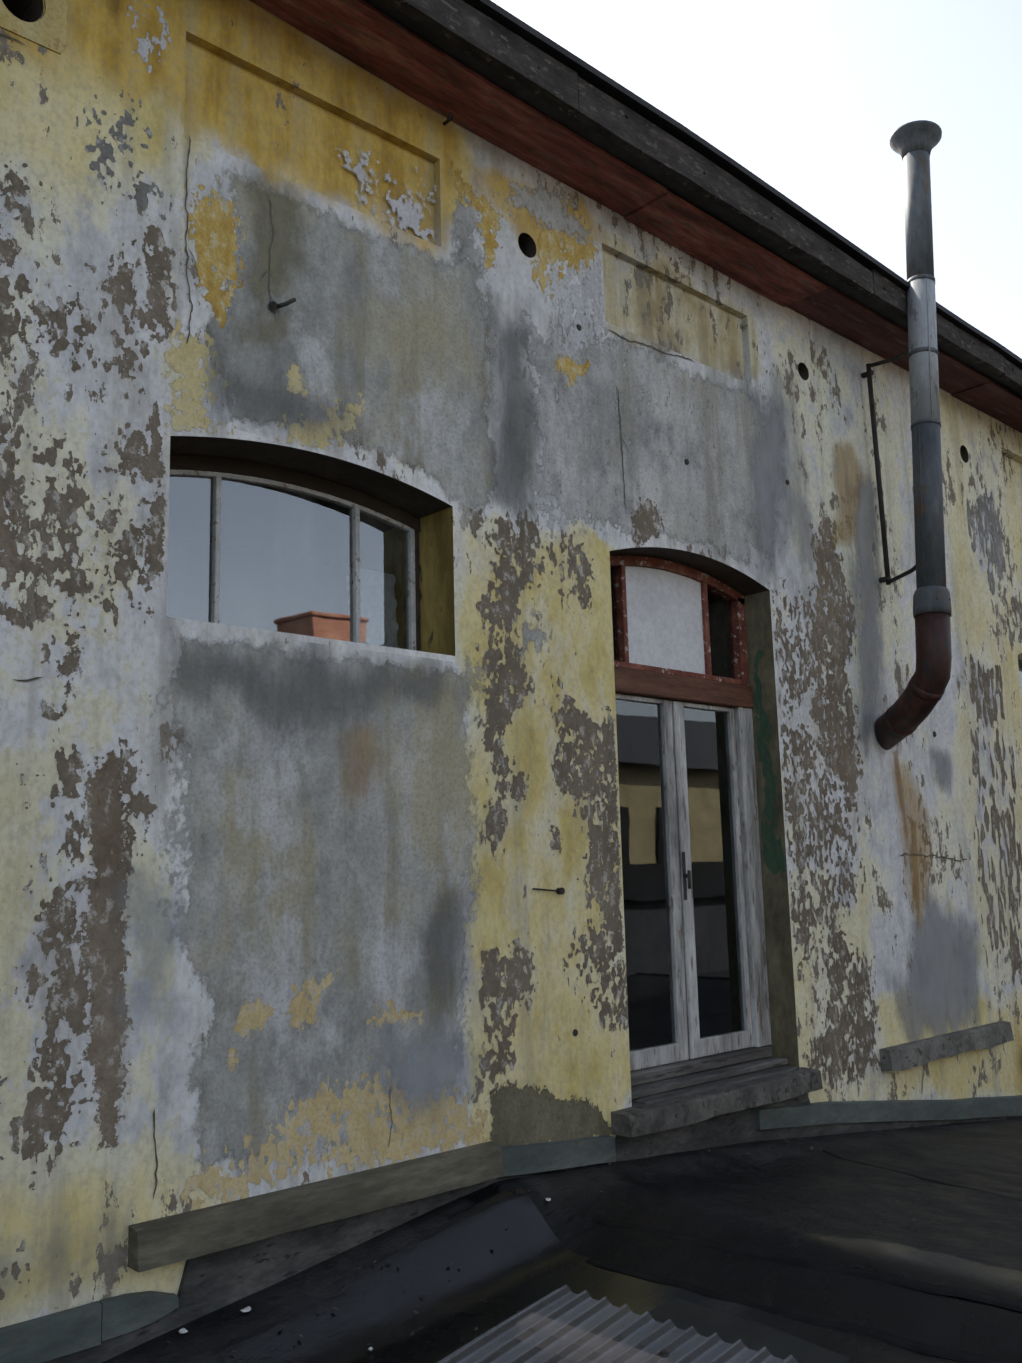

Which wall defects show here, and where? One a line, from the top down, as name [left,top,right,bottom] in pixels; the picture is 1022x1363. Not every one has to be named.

damp [248,179,298,297]
peeling [335,149,437,241]
flaking render [451,197,488,273]
damp [497,333,530,508]
peeling [0,76,183,1190]
peeling [962,485,1022,648]
peeling [469,503,627,1031]
peeling [765,513,884,1091]
peeling [969,654,1022,986]
peeling [463,932,537,1104]